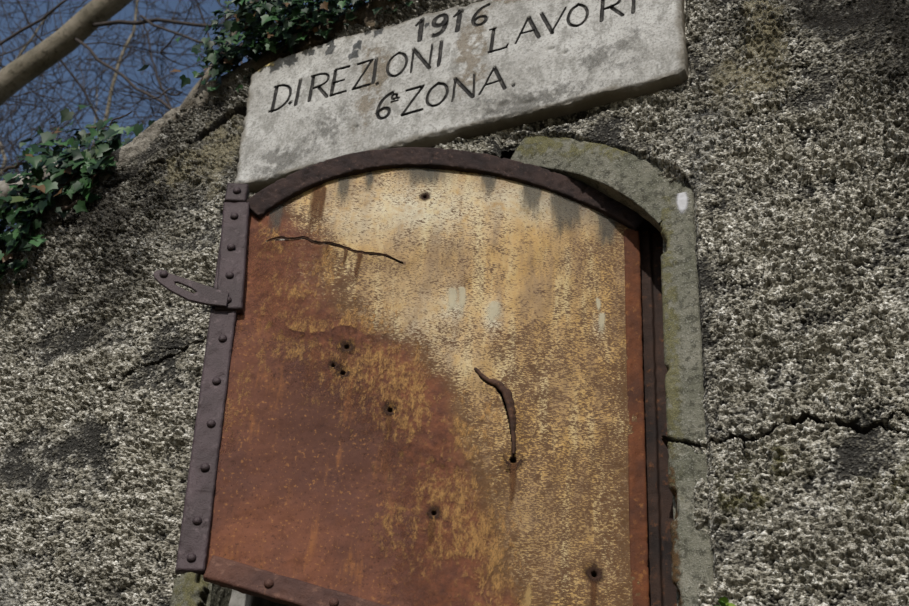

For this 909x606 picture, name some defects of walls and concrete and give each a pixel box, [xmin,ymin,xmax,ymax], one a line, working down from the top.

corrosion [310,184,326,225]
corrosion [197,233,457,606]
crack [661,410,909,457]